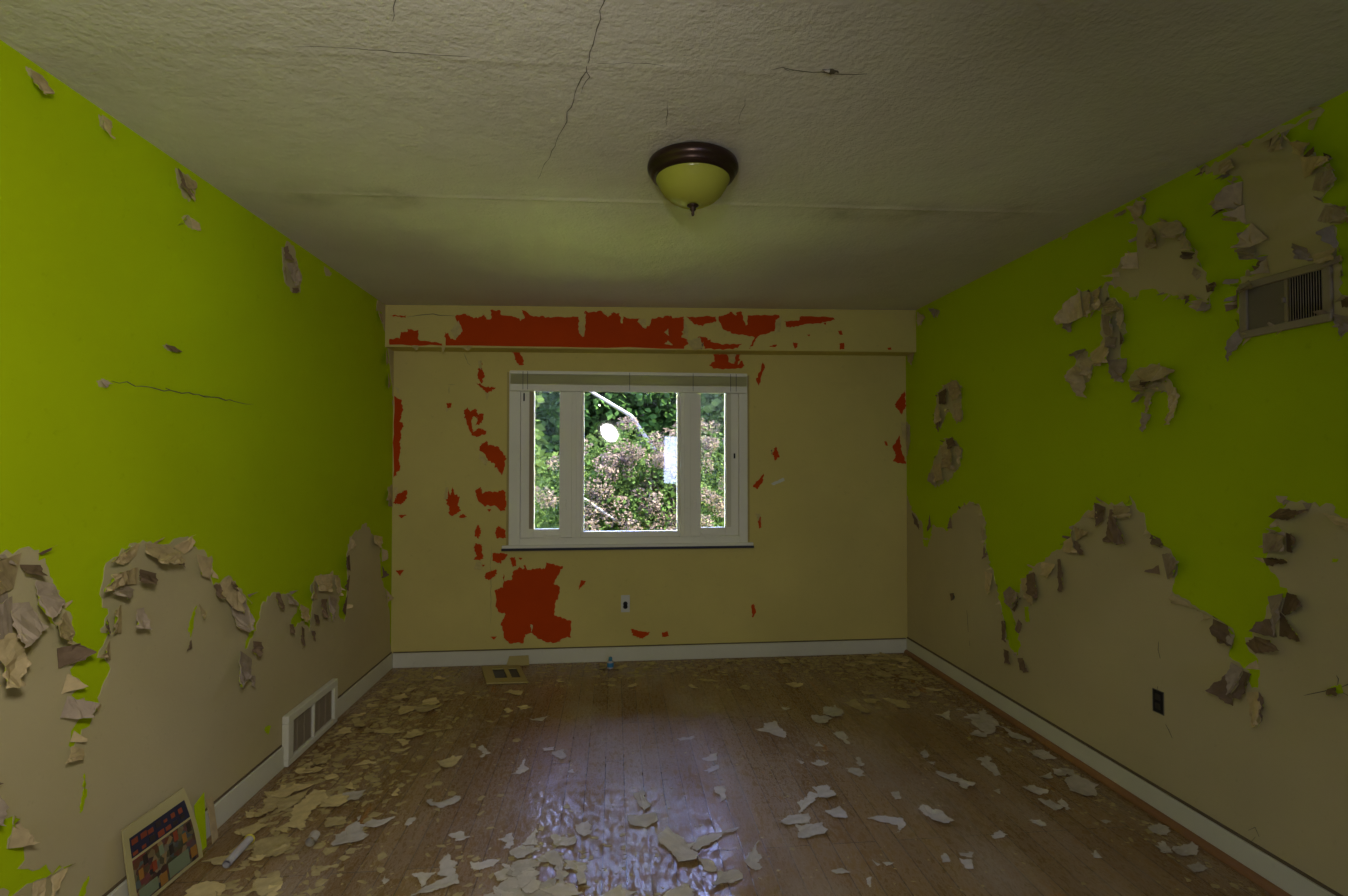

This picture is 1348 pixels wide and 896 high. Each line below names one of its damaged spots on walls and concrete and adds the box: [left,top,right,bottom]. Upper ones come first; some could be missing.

crack [306,0,466,57]
peeling [25,66,55,95]
crack [539,0,670,177]
peeling [98,114,116,139]
peeling [175,168,201,231]
peeling [282,241,302,293]
peeling [1054,106,1348,432]
crack [113,381,244,404]
peeling [376,300,844,666]
peeling [0,523,404,896]
peeling [907,496,1348,896]